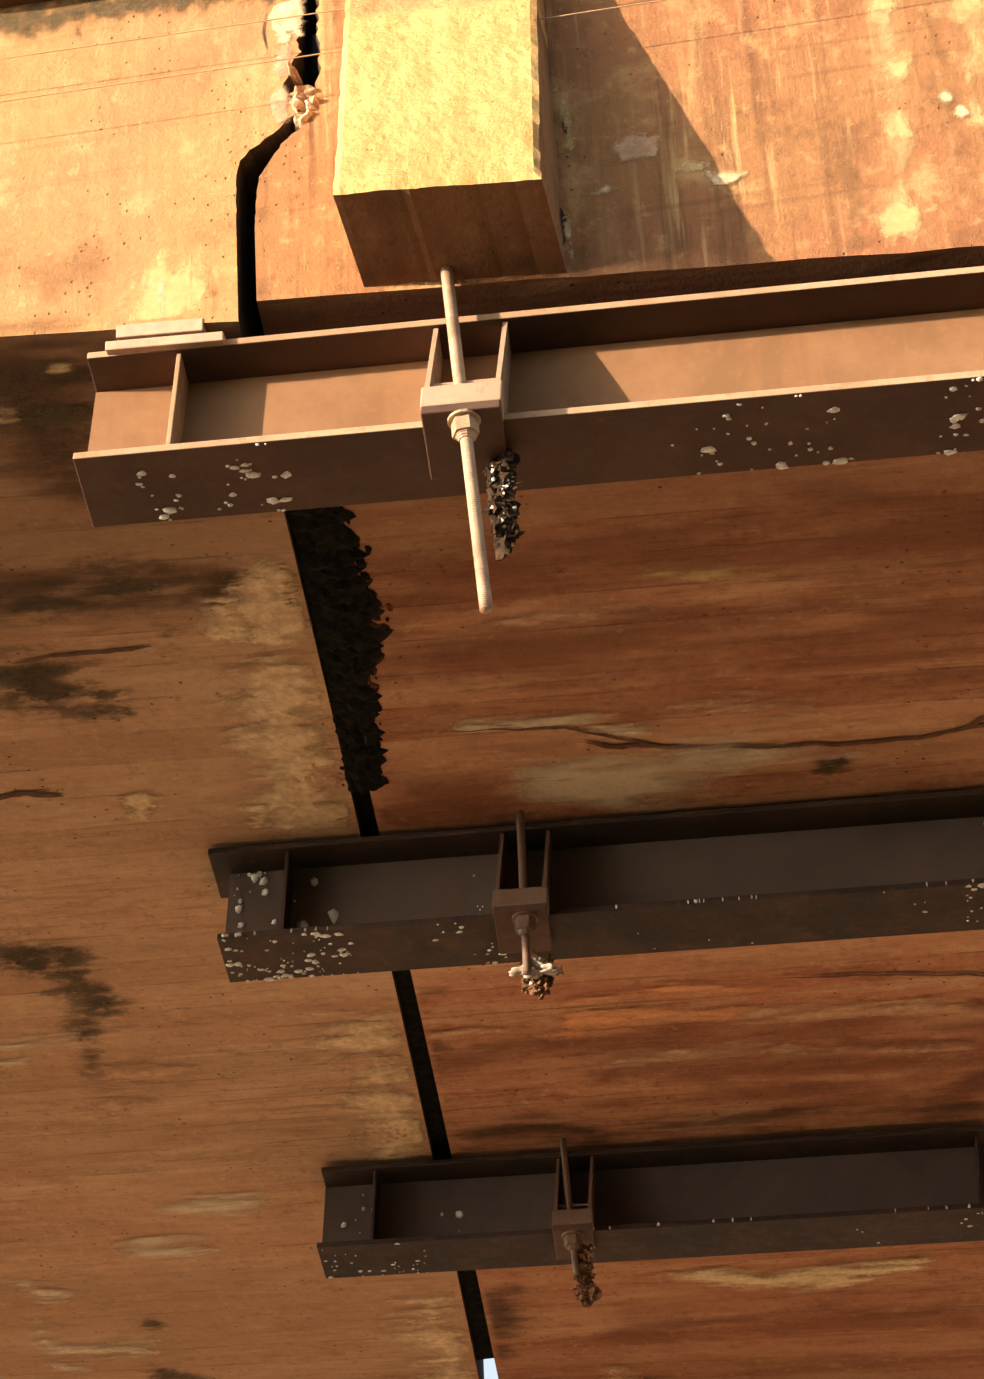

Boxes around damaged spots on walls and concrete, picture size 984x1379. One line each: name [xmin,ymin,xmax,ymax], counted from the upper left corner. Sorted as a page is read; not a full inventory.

spalling [268,0,303,123]
water stain [0,663,117,719]
spalling [202,565,349,831]
crack [440,717,984,750]
water stain [0,946,120,1065]